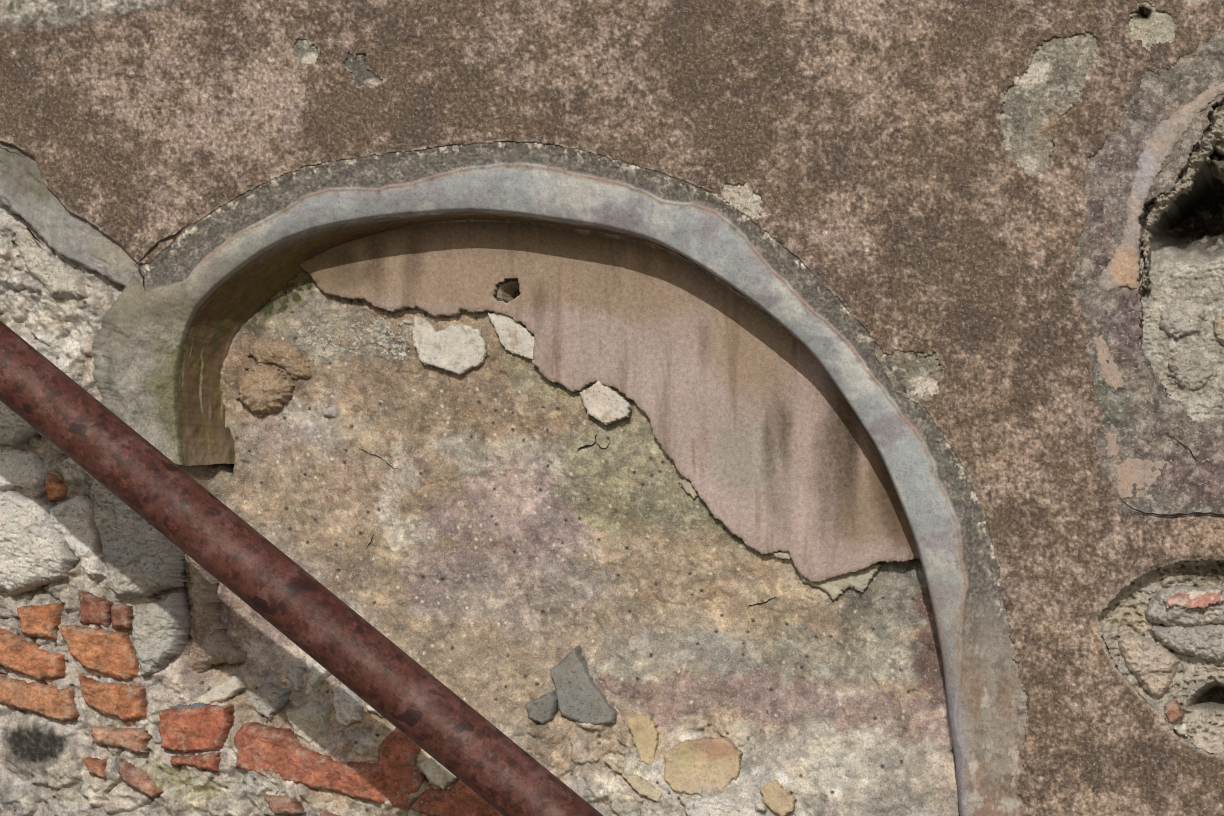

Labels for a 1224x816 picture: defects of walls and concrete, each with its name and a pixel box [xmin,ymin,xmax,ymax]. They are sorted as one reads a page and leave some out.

spalling [1129,1,1176,51]
spalling [1000,32,1099,178]
spalling [1064,22,1224,525]
peeling [412,312,535,376]
peeling [580,381,632,425]
spalling [875,346,945,404]
peeling [679,478,699,499]
peeling [772,551,882,600]
spalling [1099,559,1224,756]
peeling [604,713,743,805]
peeling [759,780,797,816]